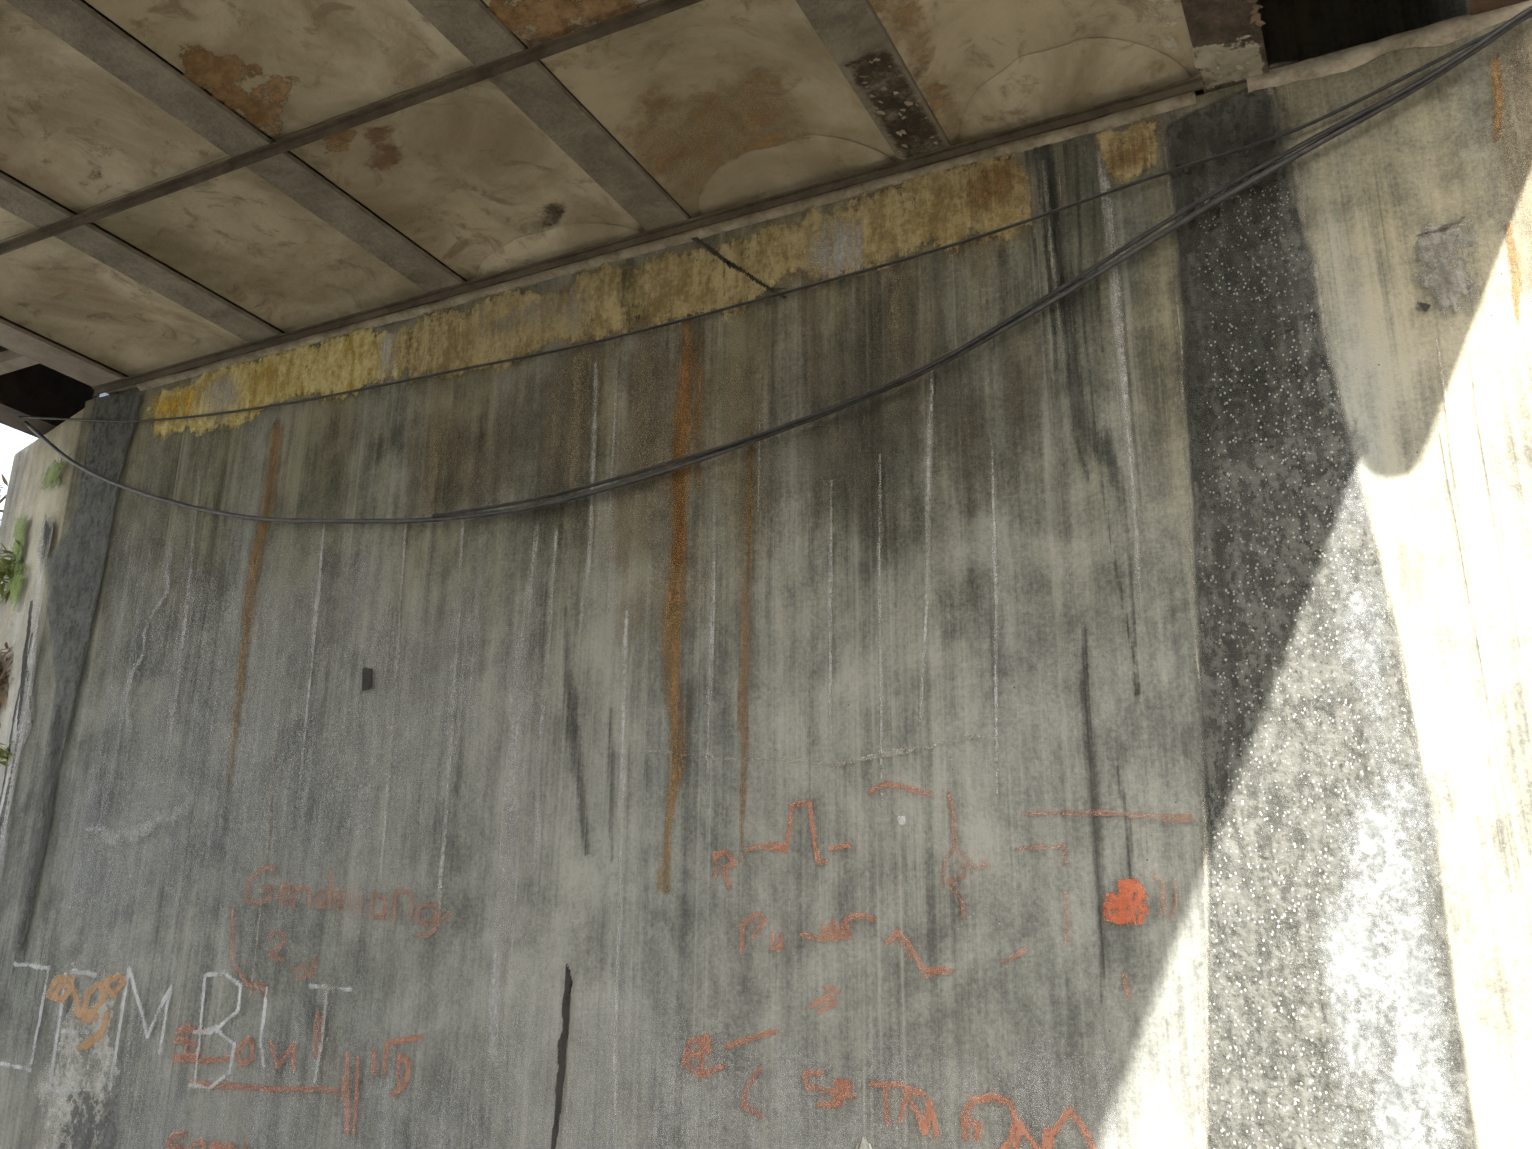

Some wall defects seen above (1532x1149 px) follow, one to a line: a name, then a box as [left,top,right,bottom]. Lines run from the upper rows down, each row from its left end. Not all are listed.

damp [179,46,299,135]
damp [1192,35,1264,90]
damp [0,618,38,816]
crack [0,569,41,878]
rust [228,420,280,785]
damp [16,144,1085,951]
rust [663,315,701,892]
damp [1073,87,1478,1149]
crack [551,963,573,1149]